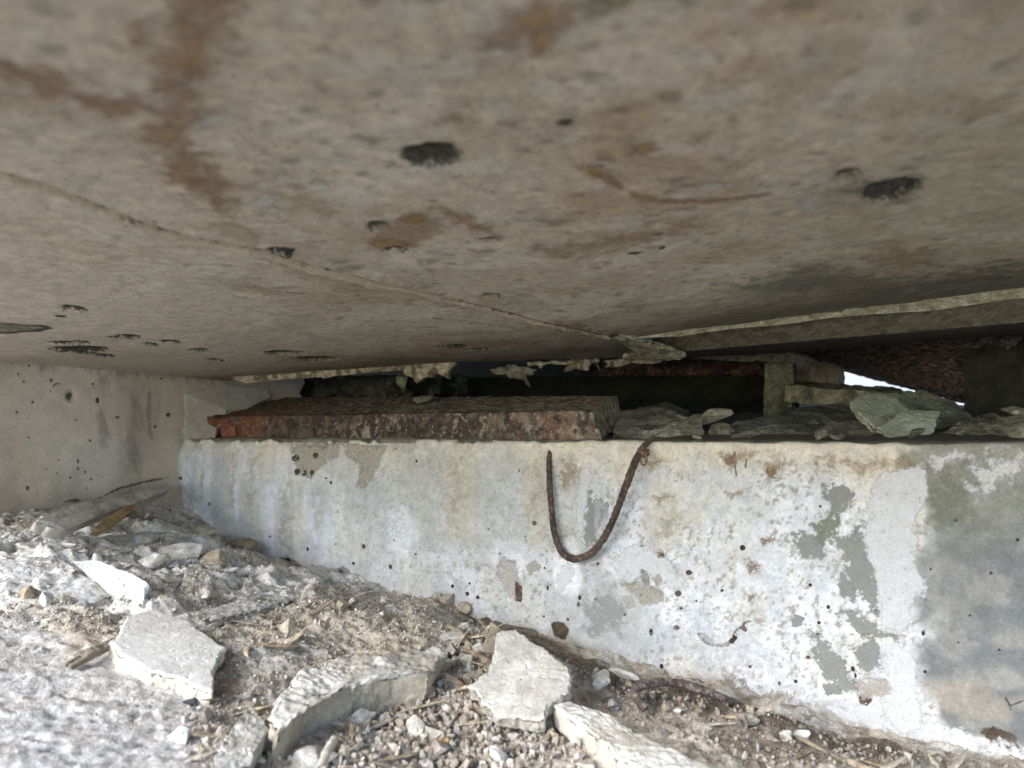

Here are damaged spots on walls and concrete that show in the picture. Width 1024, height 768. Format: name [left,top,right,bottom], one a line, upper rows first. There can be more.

crack [0,171,628,341]
rust [369,208,498,251]
spalling [291,443,386,490]
peeling [788,482,900,706]
leakage [810,446,1024,760]